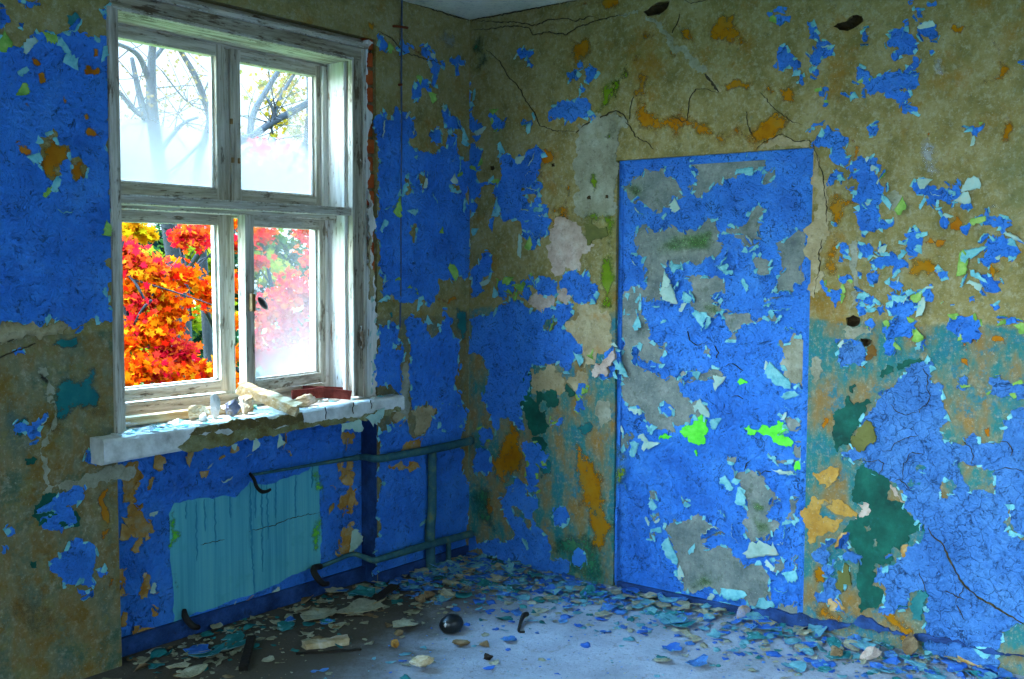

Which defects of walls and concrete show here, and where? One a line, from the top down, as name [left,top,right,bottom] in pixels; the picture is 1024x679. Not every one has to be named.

crack [416,0,653,149]
peeling [767,5,791,26]
peeling [773,0,940,117]
peeling [0,2,125,334]
crack [746,96,828,294]
peeling [178,33,1024,679]
peeling [119,455,166,554]
crack [919,528,1024,624]